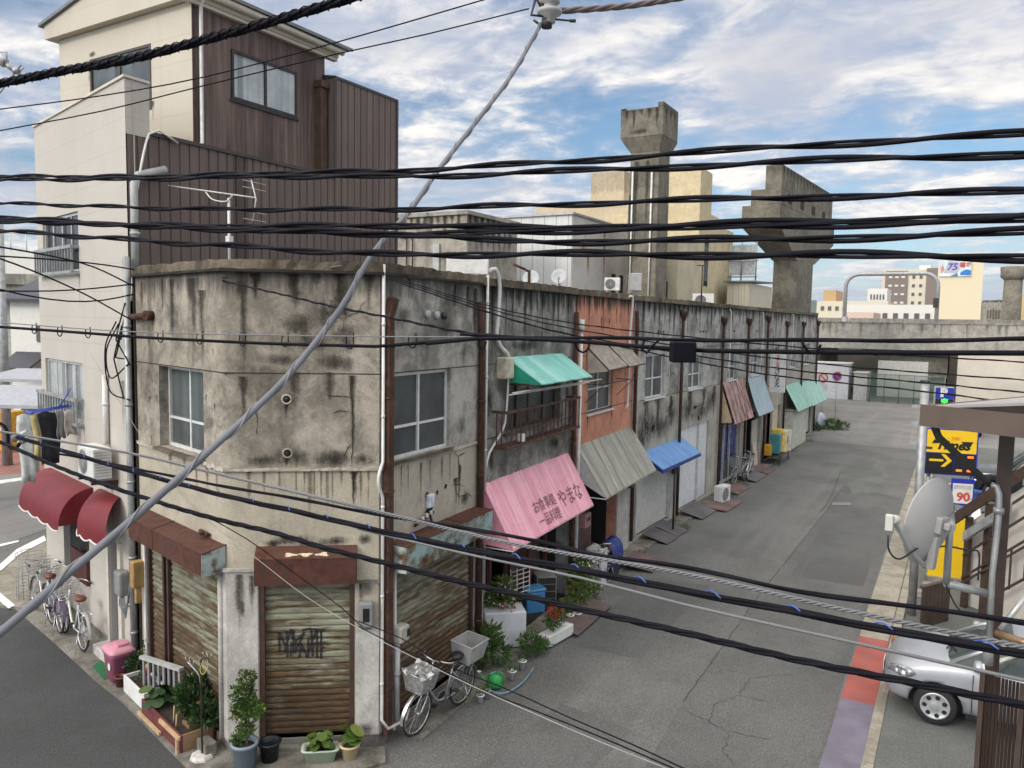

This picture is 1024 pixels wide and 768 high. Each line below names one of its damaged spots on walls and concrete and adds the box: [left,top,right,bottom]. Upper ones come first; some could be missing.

damp [187,278,204,321]
damp [237,272,260,349]
damp [289,274,301,297]
crack [326,379,354,503]
damp [327,355,354,428]
damp [639,386,716,444]
damp [279,452,369,496]
crack [452,451,472,504]
damp [236,574,254,613]